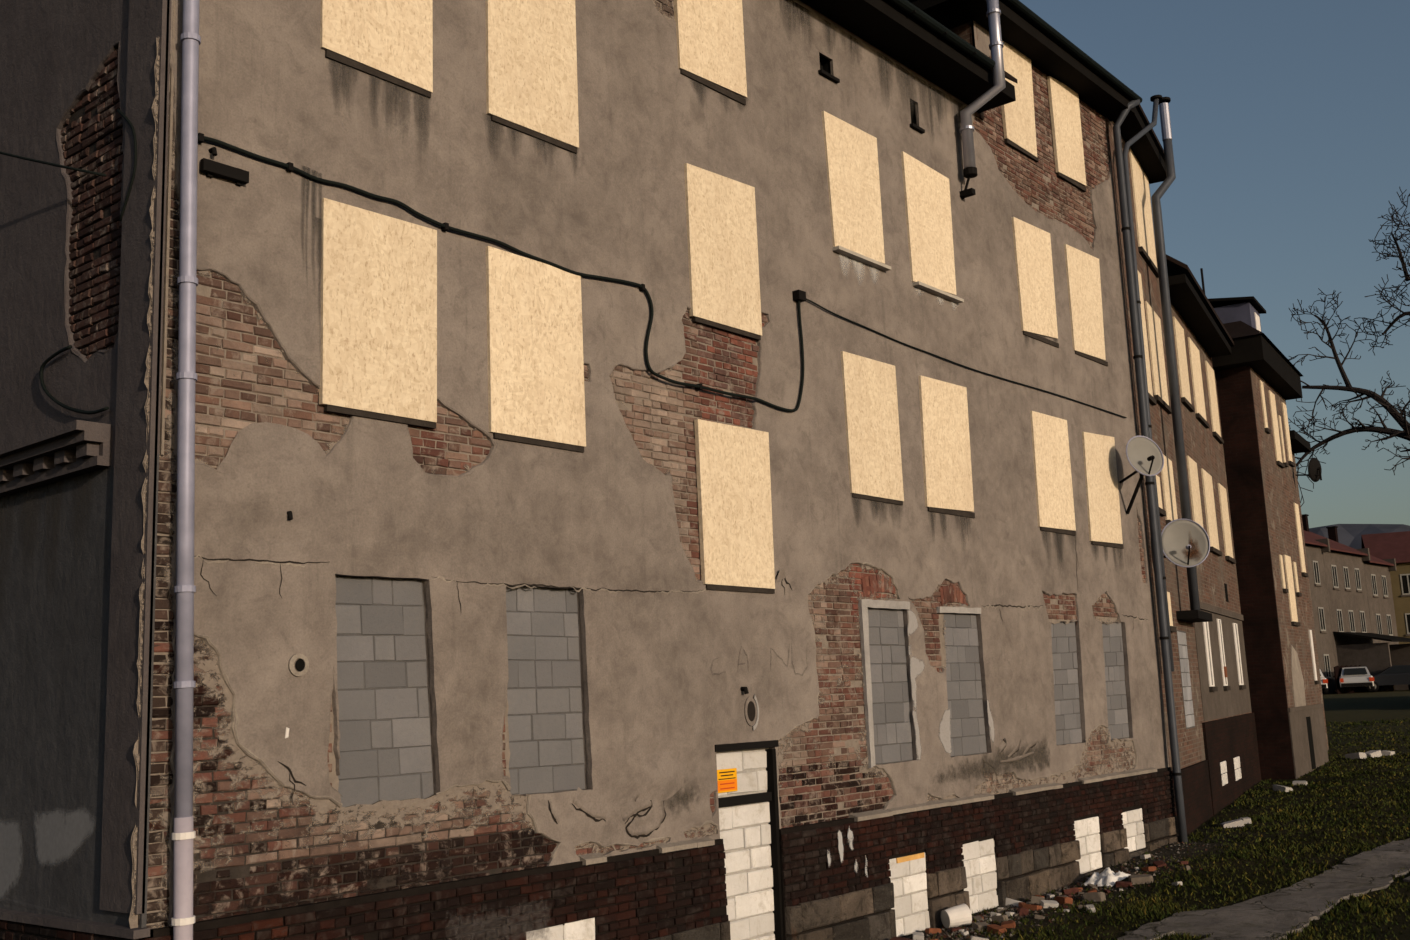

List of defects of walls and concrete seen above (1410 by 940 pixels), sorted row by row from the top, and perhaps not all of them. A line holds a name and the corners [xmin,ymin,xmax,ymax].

spalling [652,0,674,20]
spalling [56,41,124,363]
spalling [973,64,1111,251]
spalling [129,37,181,929]
crack [194,554,327,596]
spalling [195,267,354,473]
spalling [407,395,497,478]
spalling [193,633,718,922]
spalling [584,305,771,585]
spalling [777,562,970,828]
spalling [974,725,1138,795]
spalling [1042,590,1121,625]